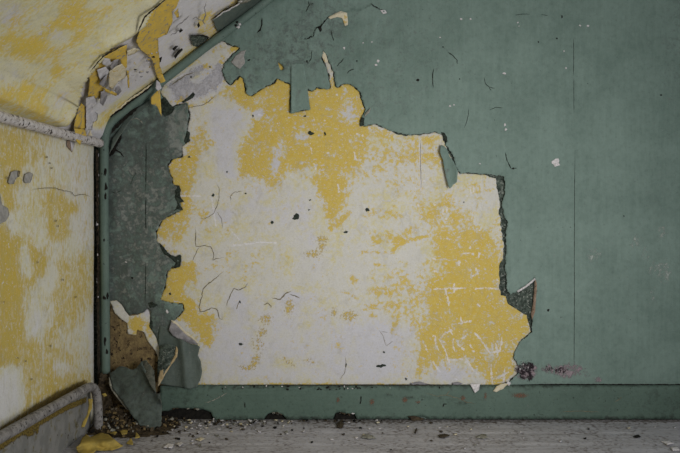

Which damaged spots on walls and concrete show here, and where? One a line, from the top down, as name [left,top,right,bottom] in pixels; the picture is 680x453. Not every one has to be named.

flaking render [8,170,33,184]
peeling [67,0,537,412]
crack [193,191,248,320]
damp [514,362,584,381]
spalling [161,408,214,420]